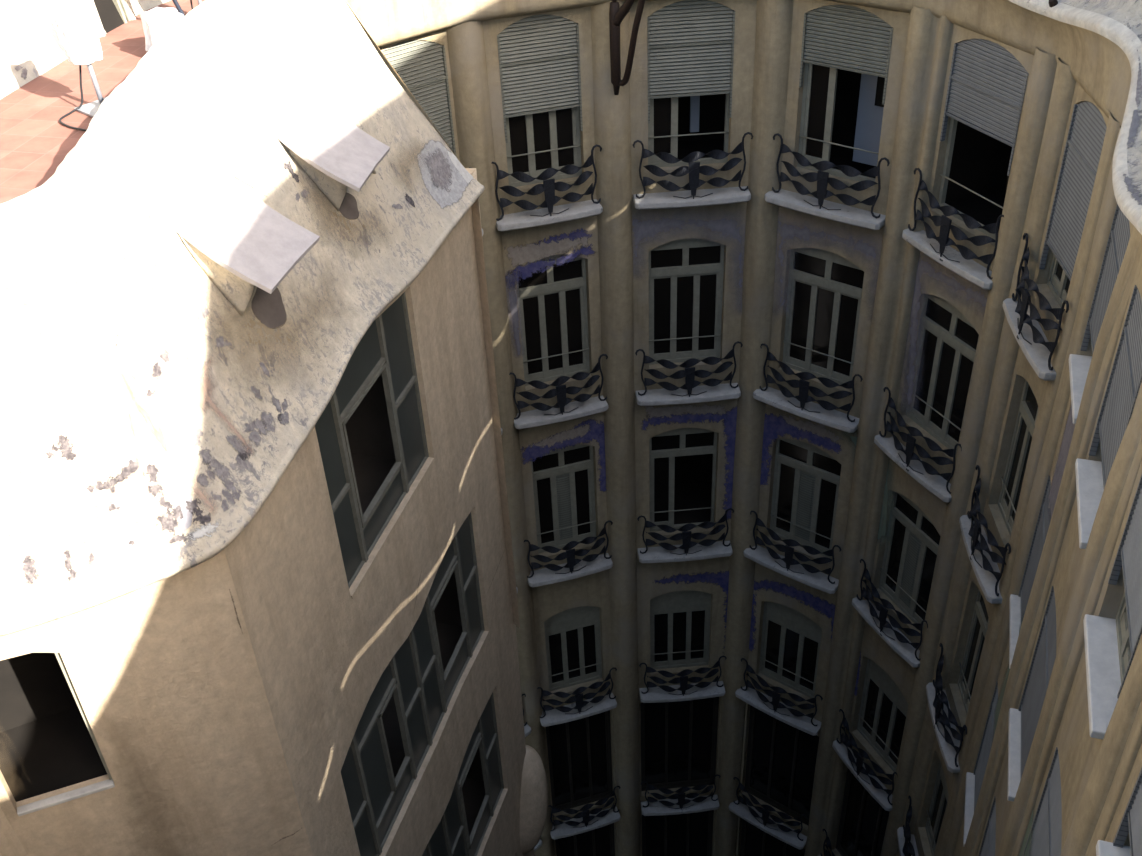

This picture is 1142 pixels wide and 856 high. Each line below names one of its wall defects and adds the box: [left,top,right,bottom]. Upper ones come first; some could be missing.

peeling [424,148,473,192]
spalling [46,428,104,461]
spalling [86,386,289,544]
peeling [17,541,80,586]